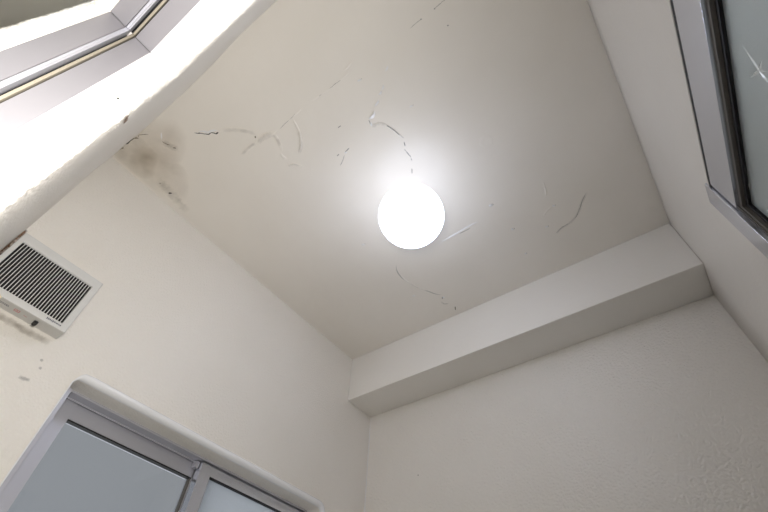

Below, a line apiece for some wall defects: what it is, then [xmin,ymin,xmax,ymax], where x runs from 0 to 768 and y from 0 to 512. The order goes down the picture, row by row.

crack [369,66,412,160]